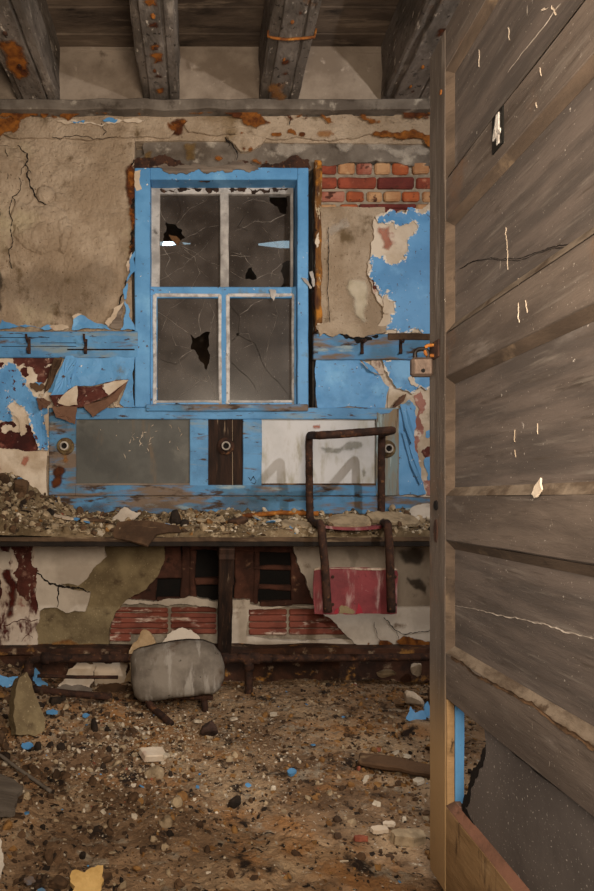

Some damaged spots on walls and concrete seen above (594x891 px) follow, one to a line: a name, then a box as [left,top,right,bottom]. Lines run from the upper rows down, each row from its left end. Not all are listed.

rust [0,41,28,80]
crack [0,145,46,268]
spalling [0,115,430,334]
crack [459,234,594,269]
peeling [0,355,135,495]
peeling [315,360,430,497]
crack [455,605,594,639]